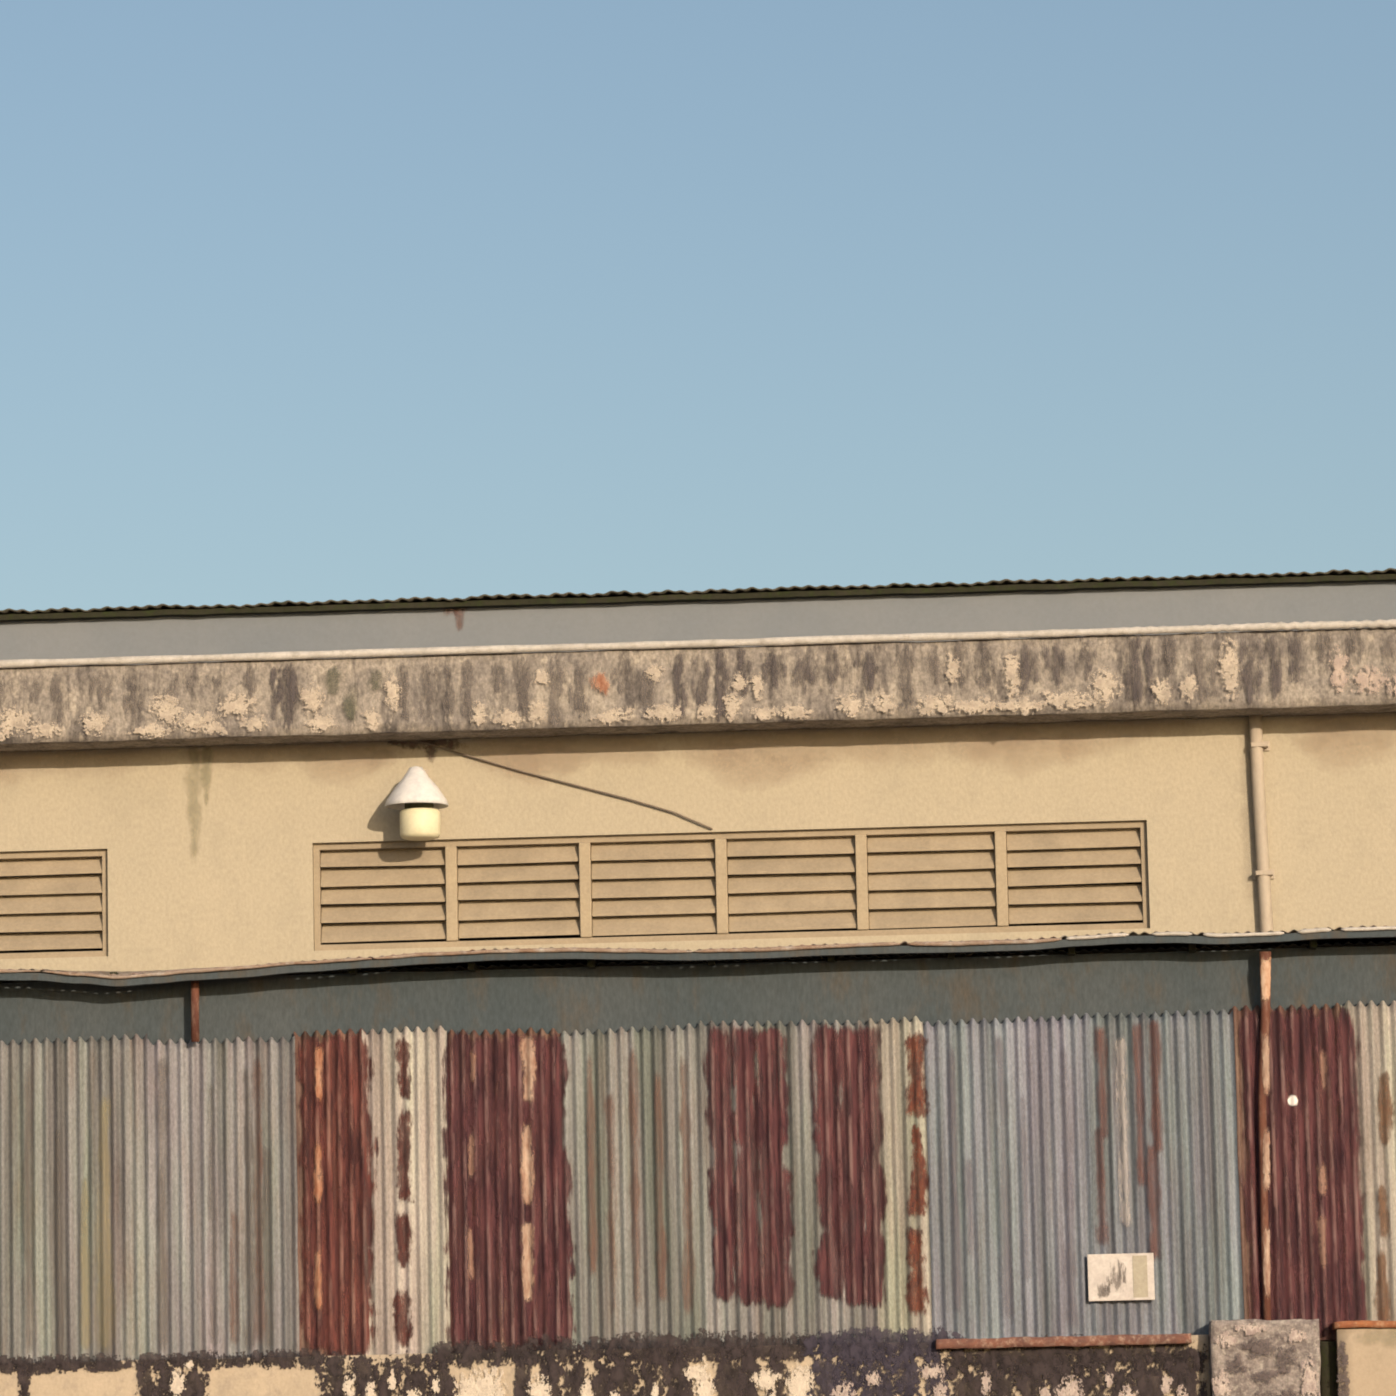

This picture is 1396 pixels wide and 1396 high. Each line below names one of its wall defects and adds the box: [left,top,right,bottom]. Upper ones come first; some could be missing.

leakage [243,663,298,728]
leakage [670,641,992,720]
leakage [1013,637,1097,696]
leakage [1239,632,1330,703]
leakage [244,1075,270,1288]
corrosion [295,1033,379,1356]
corrosion [394,1038,412,1268]
corrosion [442,1031,615,1350]
corrosion [703,1025,795,1310]
corrosion [810,1023,888,1308]
corrosion [1239,1006,1391,1338]
leakage [0,1228,1210,1396]